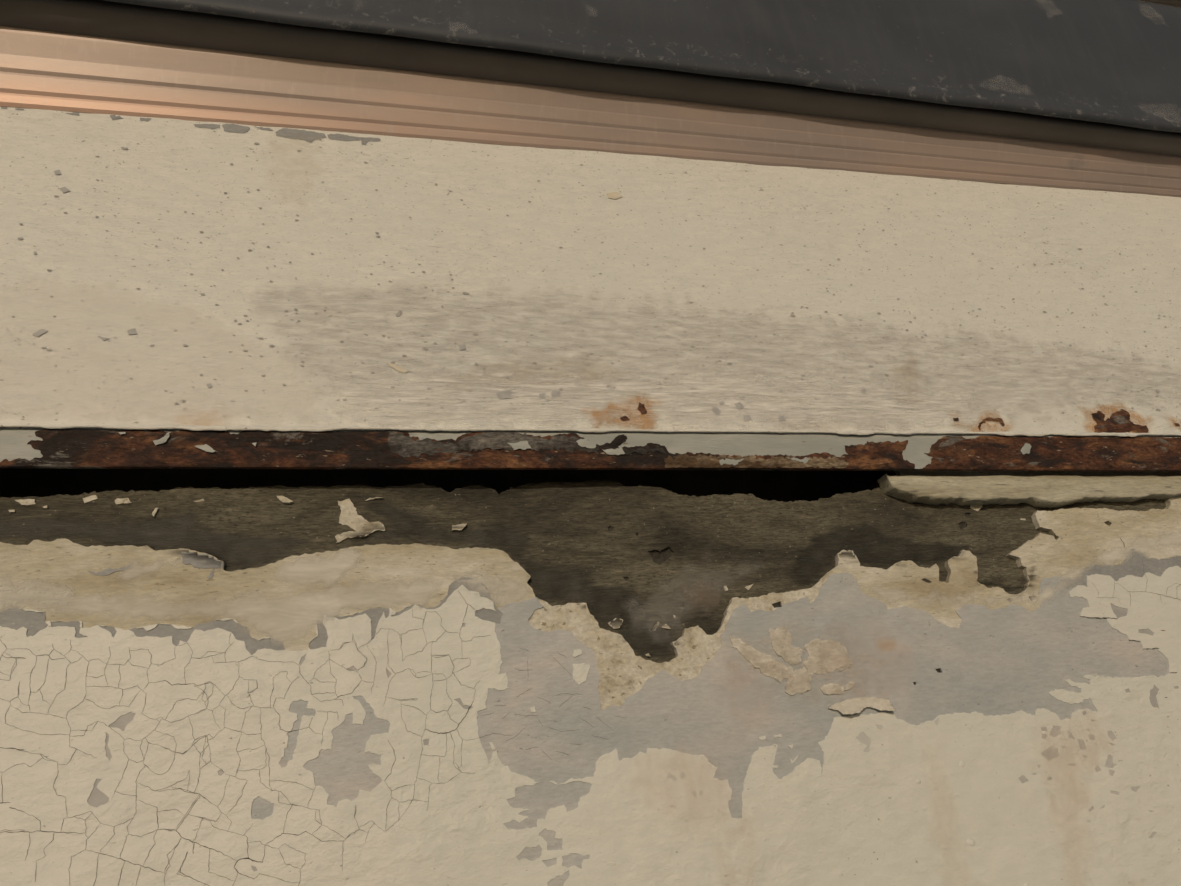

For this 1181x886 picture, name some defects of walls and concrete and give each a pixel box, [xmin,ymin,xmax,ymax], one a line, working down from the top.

rust [0,397,1181,470]
damp [0,514,304,566]
crack [0,591,623,886]
damp [354,495,685,656]
peeling [0,471,1181,886]
damp [794,527,967,585]
damp [980,575,1035,595]
crack [1080,558,1181,698]